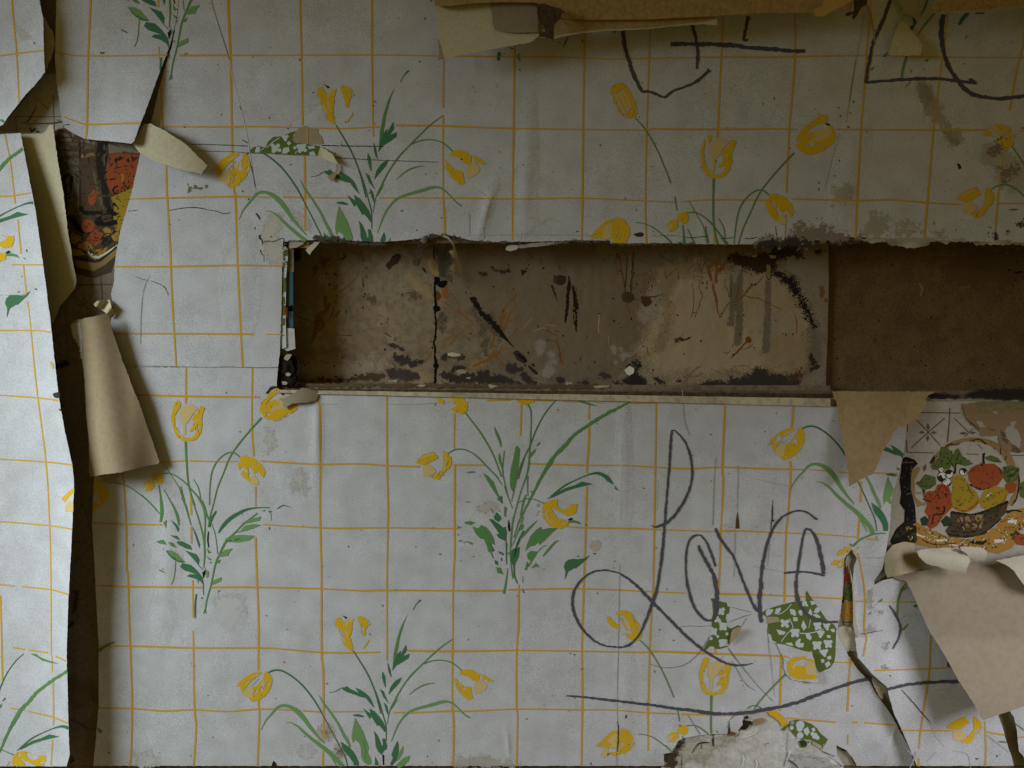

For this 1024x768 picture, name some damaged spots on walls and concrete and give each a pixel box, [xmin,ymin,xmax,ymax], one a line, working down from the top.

spalling [386,254,401,269]
spalling [469,297,527,363]
spalling [551,275,578,331]
spalling [962,400,1024,453]
peeling [676,707,844,768]